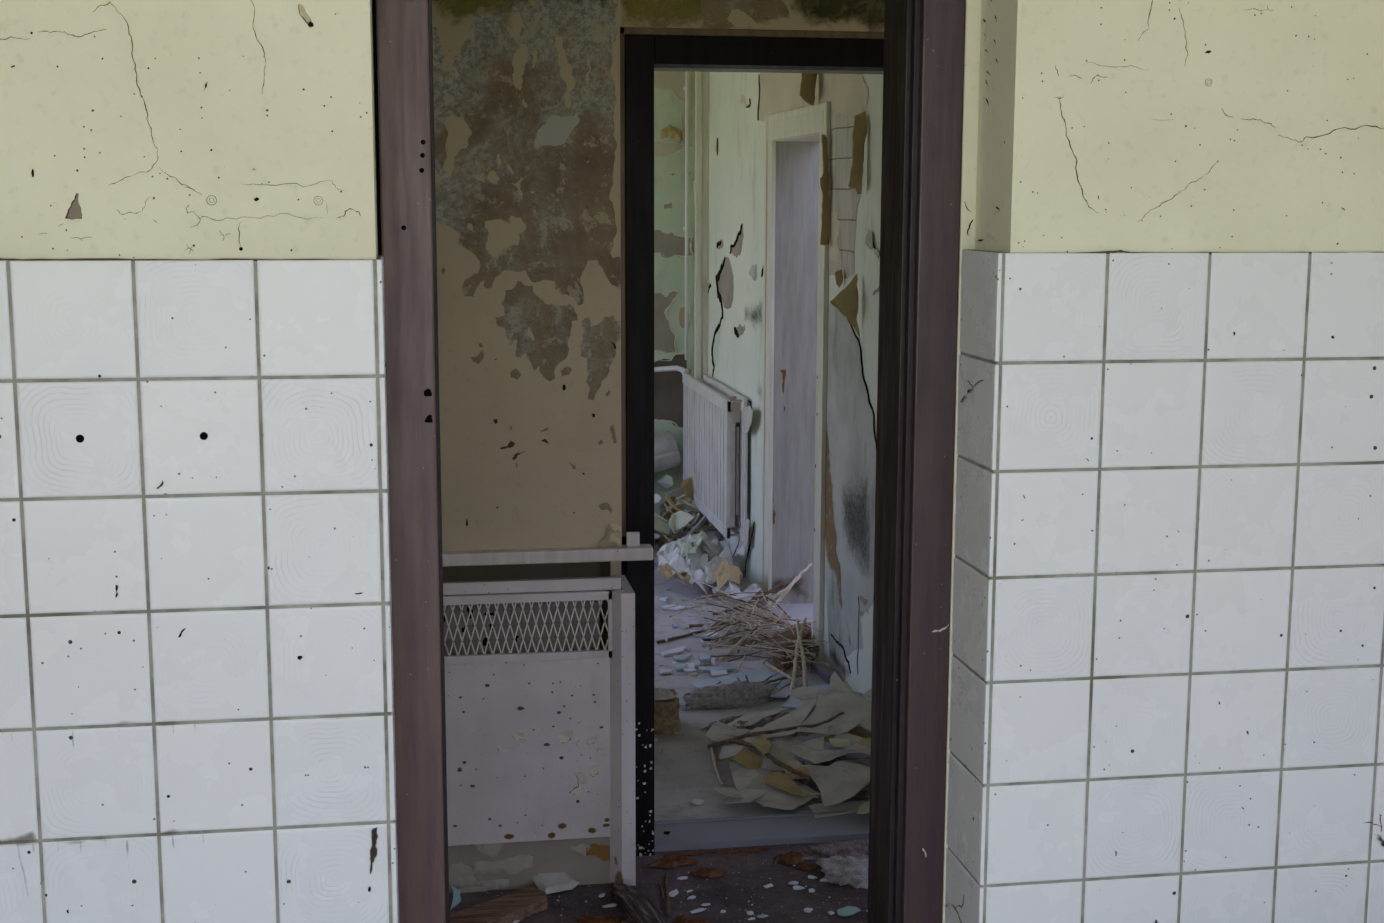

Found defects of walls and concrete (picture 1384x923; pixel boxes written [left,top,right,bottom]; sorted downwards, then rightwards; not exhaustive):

crack [0,2,375,261]
peeling [432,0,621,400]
peeling [708,223,763,377]
peeling [740,73,880,279]
crack [1055,0,1188,212]
crack [1079,163,1235,254]
crack [1222,109,1384,142]